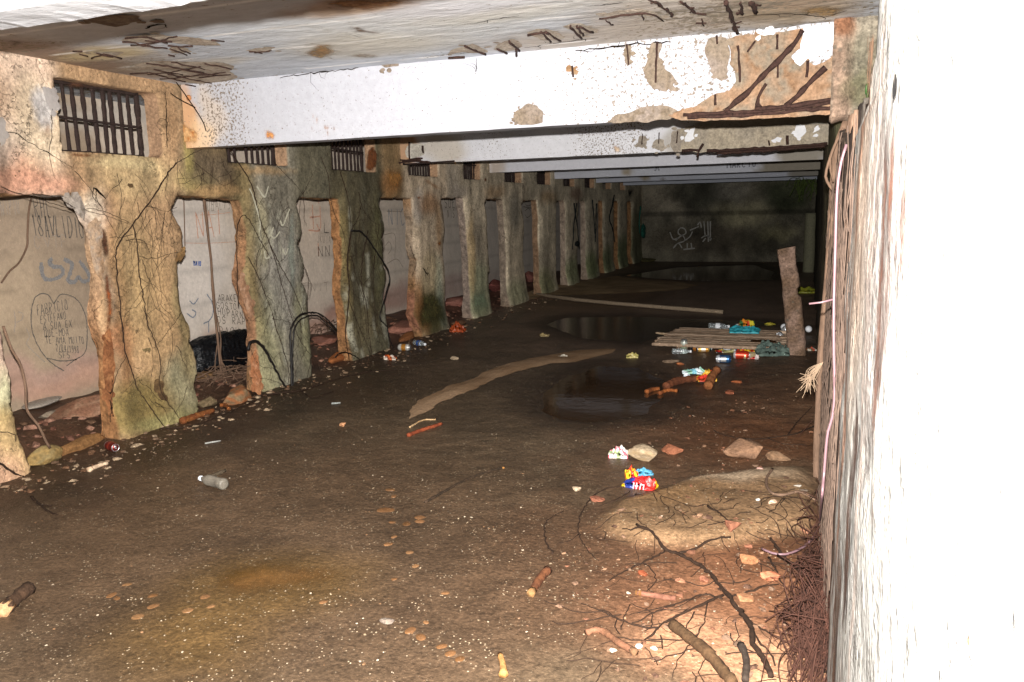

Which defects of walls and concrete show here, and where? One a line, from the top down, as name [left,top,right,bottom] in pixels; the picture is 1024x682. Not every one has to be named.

spalling [448,0,832,158]
spalling [63,192,105,281]
leakage [421,294,444,325]